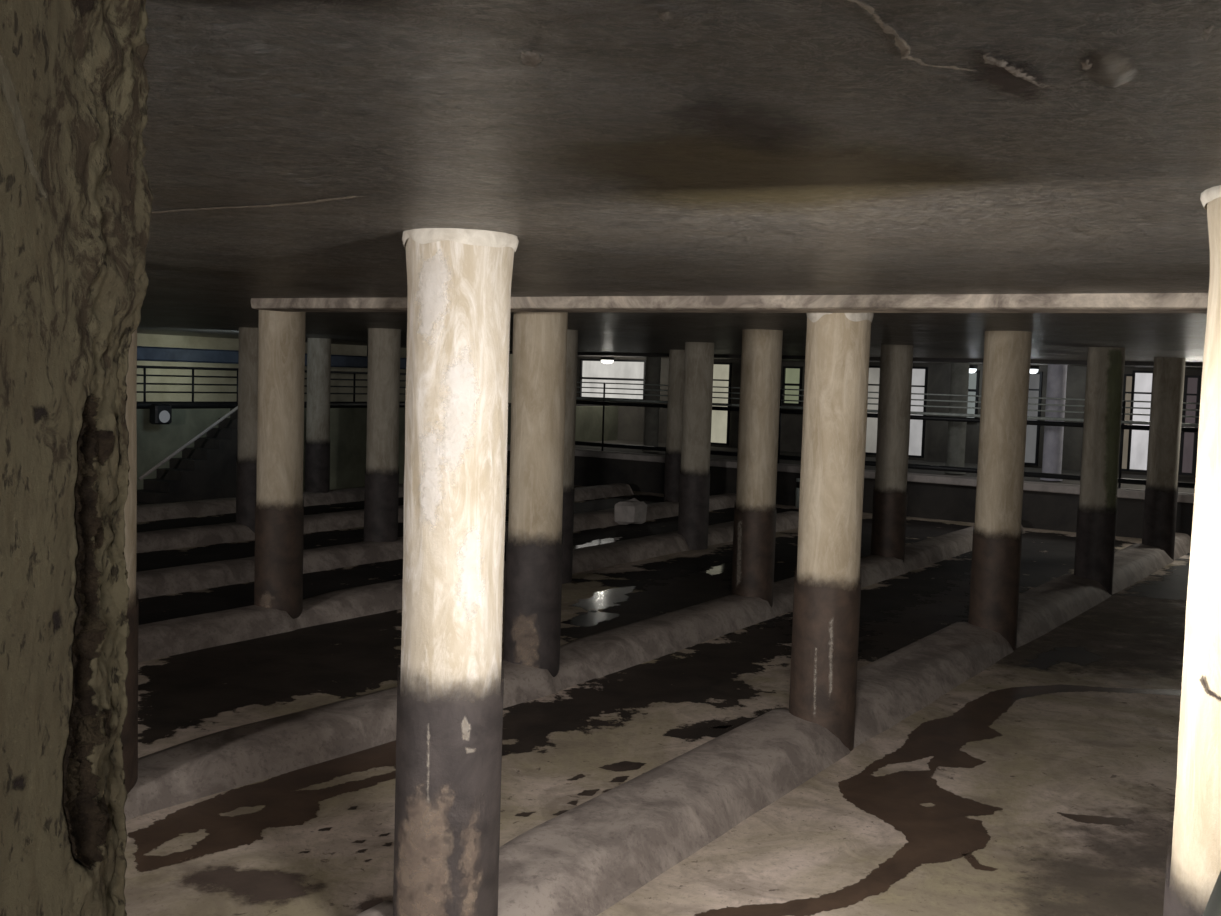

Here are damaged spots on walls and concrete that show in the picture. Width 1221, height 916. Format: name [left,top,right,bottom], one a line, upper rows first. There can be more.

crack [848,0,976,71]
spalling [968,50,1055,101]
spalling [53,395,115,870]
water stain [121,441,1208,916]
crack [1200,675,1221,701]